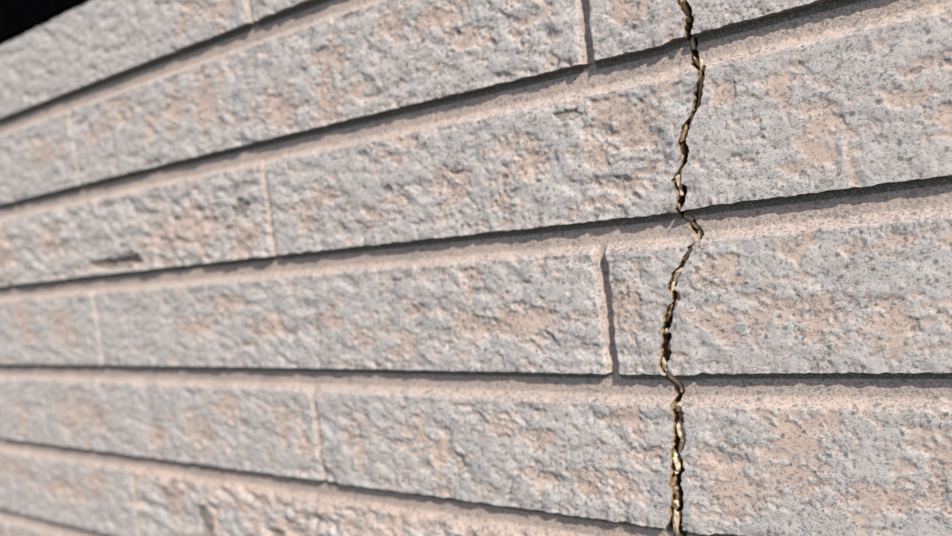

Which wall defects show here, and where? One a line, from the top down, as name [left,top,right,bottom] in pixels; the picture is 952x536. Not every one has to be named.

crack [658,0,706,536]